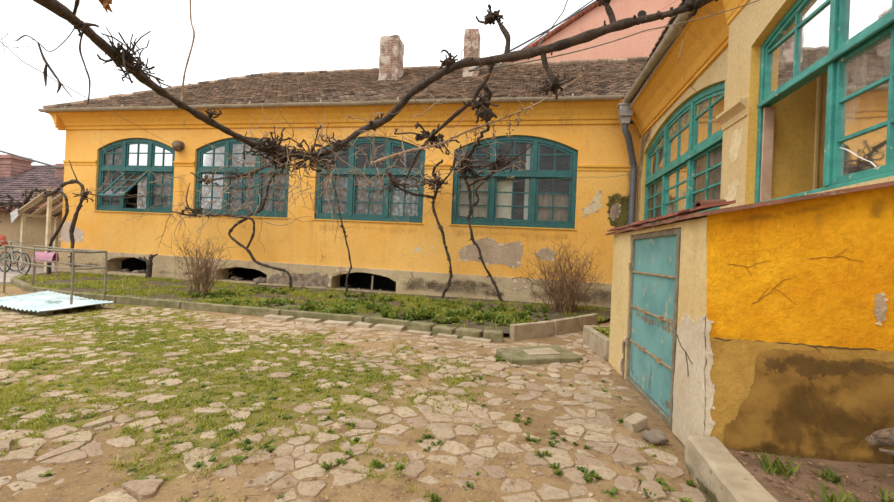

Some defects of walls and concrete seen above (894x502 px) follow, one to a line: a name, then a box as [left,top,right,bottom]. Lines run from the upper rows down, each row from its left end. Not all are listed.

peeling [582,190,621,221]
spalling [457,237,527,290]
spalling [535,247,557,261]
crack [728,260,794,304]
spalling [874,292,888,326]
peeling [672,313,716,446]
water stain [724,349,894,464]